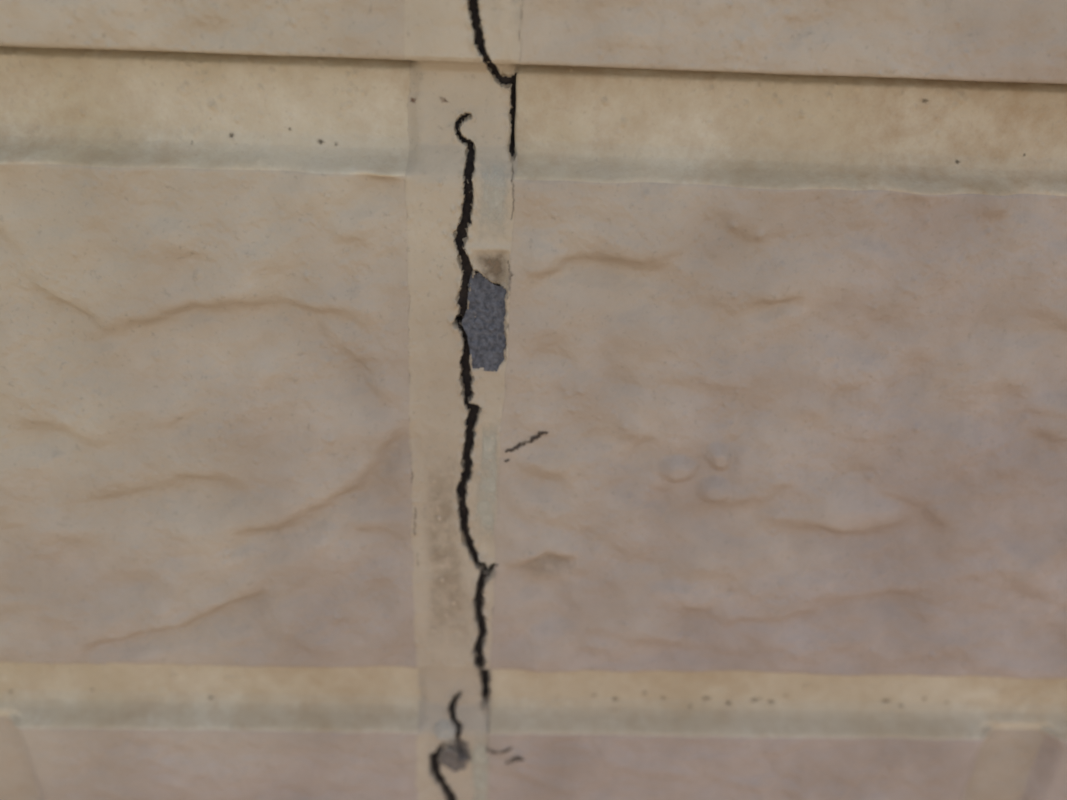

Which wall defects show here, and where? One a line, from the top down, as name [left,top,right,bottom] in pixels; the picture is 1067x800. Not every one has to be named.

crack [468,0,517,181]
peeling [462,258,507,372]
crack [429,113,524,800]
crack [504,432,548,462]